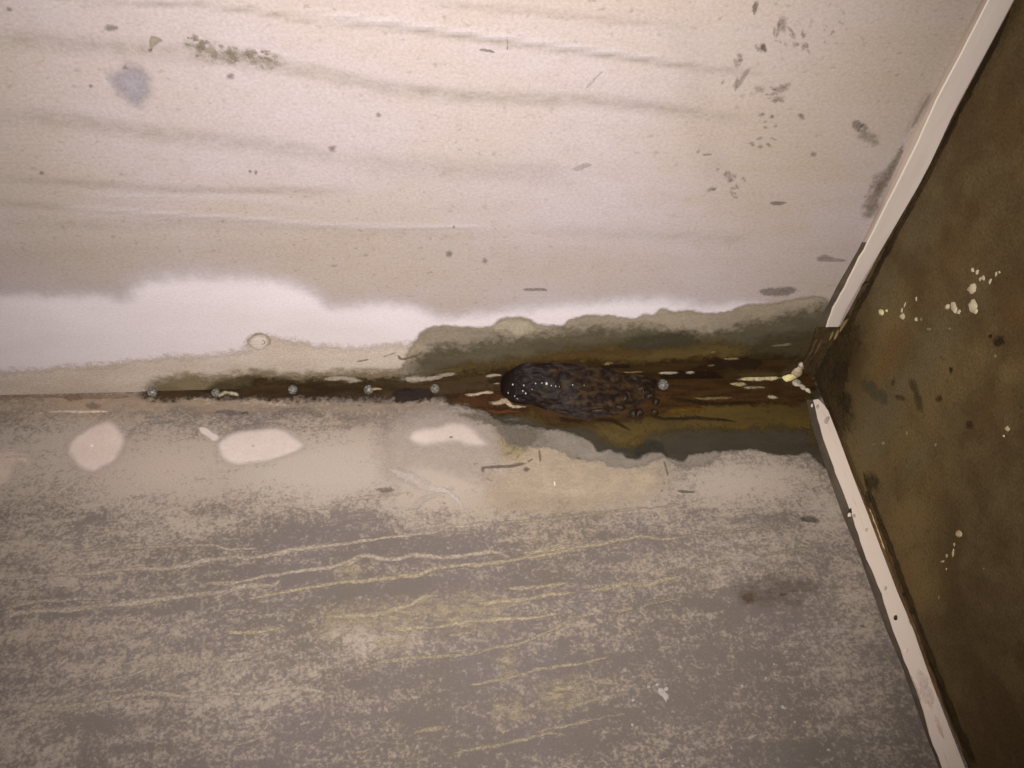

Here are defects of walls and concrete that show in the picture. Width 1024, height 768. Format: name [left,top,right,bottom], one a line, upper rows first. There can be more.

leakage [0,14,1009,468]
rust [444,350,817,429]
crack [4,462,815,668]
leakage [863,475,974,762]